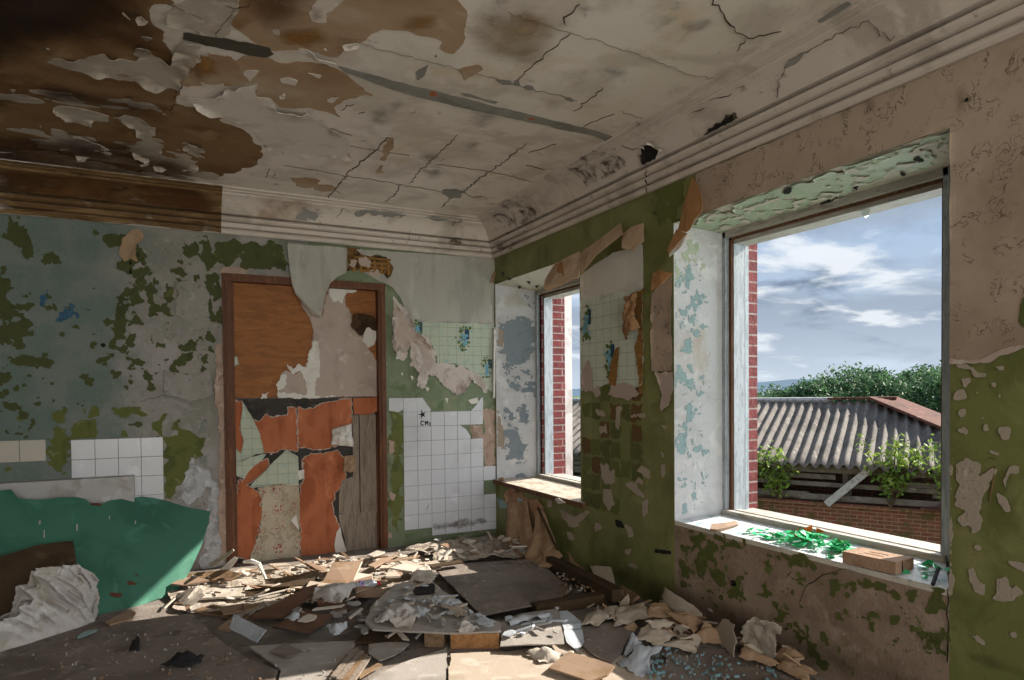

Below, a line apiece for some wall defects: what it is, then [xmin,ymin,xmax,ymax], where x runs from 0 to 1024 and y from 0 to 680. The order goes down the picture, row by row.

damp [0,0,137,47]
damp [194,56,215,77]
peeling [0,0,468,182]
crack [266,4,744,216]
spalling [639,142,662,165]
crack [712,0,781,52]
crack [776,20,895,96]
peeling [0,229,289,569]
peeling [470,272,539,478]
peeling [653,133,950,514]
peeling [655,530,841,671]
peeling [829,450,1024,656]